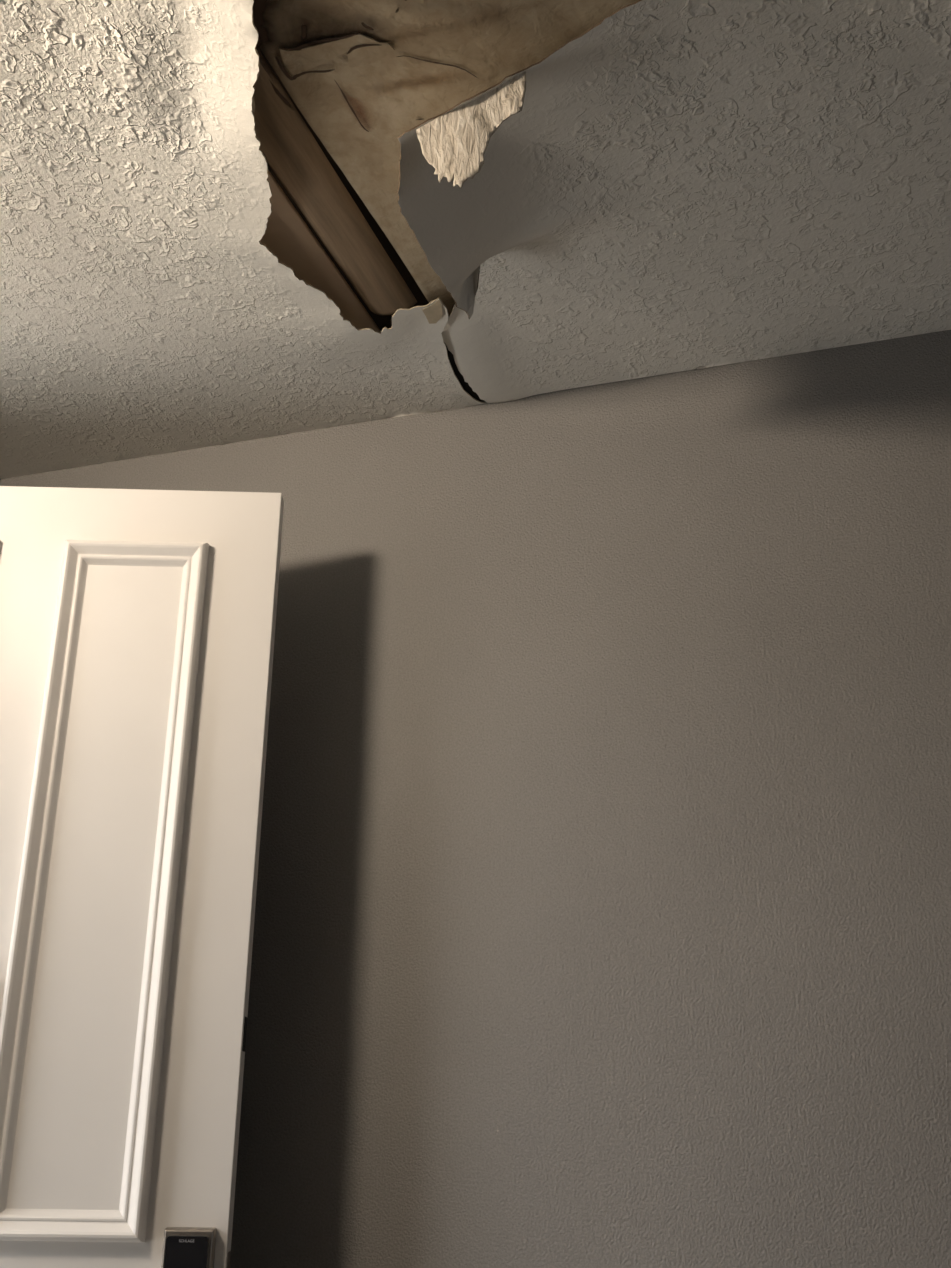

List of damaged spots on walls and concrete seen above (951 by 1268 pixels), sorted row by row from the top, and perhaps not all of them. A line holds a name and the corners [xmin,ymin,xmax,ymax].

crack [445,344,484,401]